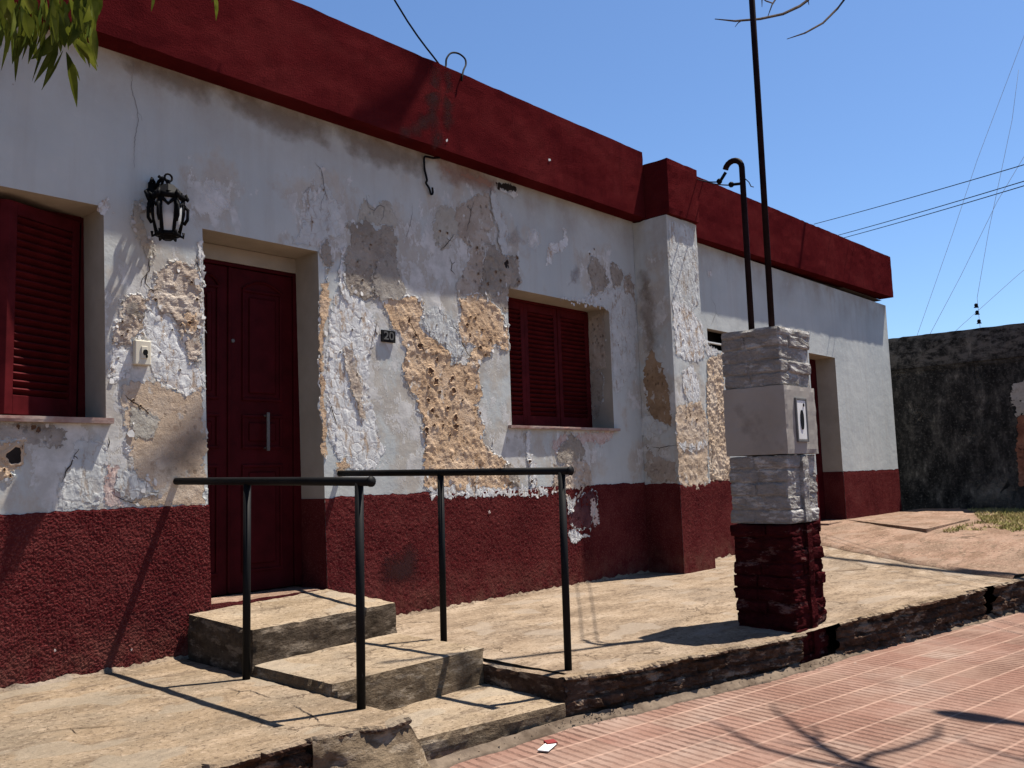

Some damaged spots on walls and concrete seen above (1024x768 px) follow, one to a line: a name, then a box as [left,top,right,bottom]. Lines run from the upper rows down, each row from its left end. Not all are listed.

flaking render [0,197,208,512]
flaking render [317,181,731,544]